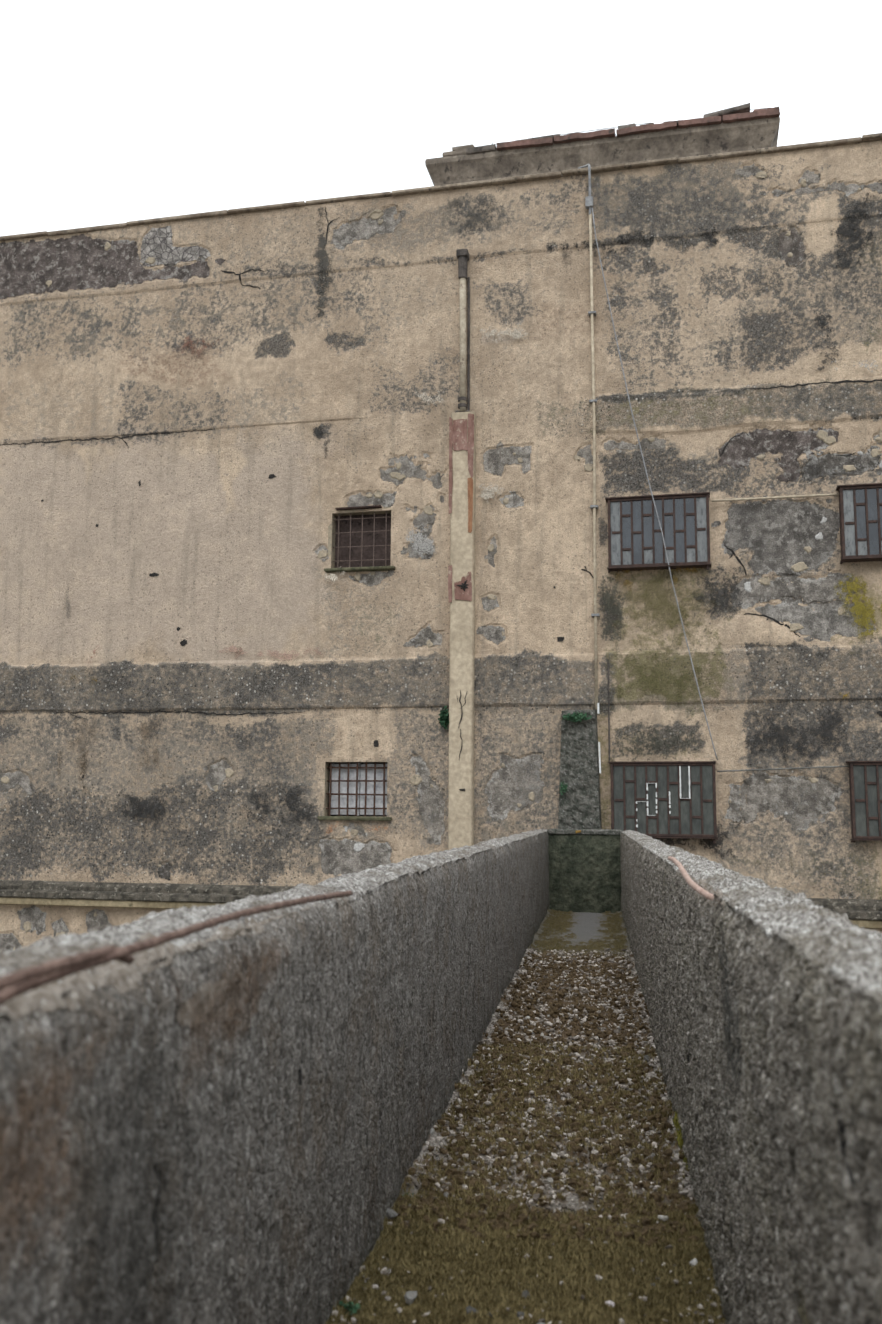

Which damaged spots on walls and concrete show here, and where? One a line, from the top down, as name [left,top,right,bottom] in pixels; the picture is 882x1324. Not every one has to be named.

peeling [735,163,882,197]
crack [140,226,262,289]
leakage [313,208,334,318]
leakage [546,231,659,257]
leakage [829,192,876,269]
leakage [813,310,878,372]
leakage [598,576,629,641]
leakage [694,564,746,617]
leakage [610,724,701,761]
leakage [745,707,851,764]
leakage [239,788,316,823]
leakage [653,817,742,860]